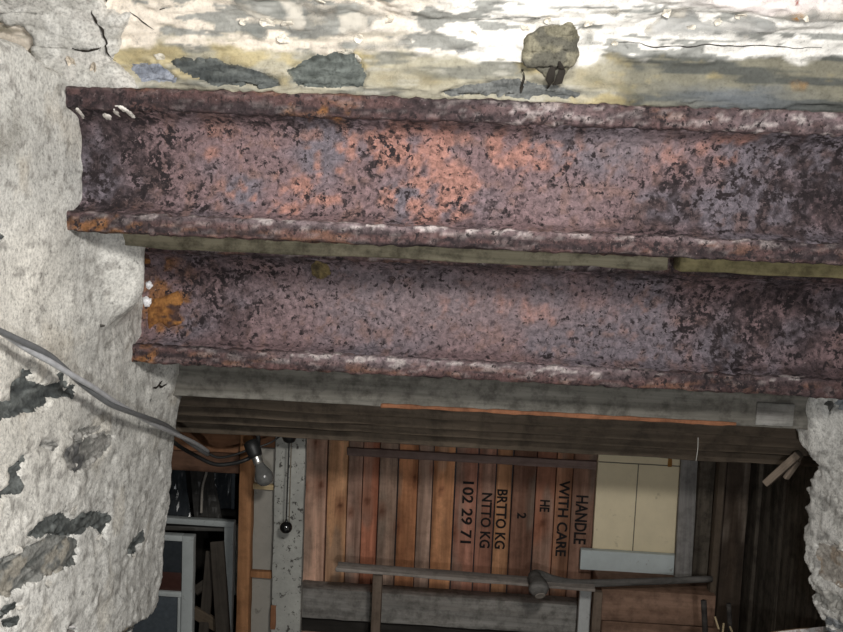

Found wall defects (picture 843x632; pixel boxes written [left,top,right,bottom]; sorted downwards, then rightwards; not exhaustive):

crack [72,0,114,60]
peeling [234,0,394,88]
peeling [645,9,776,36]
peeling [786,9,822,22]
spalling [131,53,281,89]
spalling [444,78,580,100]
corrosion [147,291,183,329]
spalling [0,368,75,421]
spalling [39,425,112,473]
spalling [0,455,25,498]
spalling [0,506,112,628]